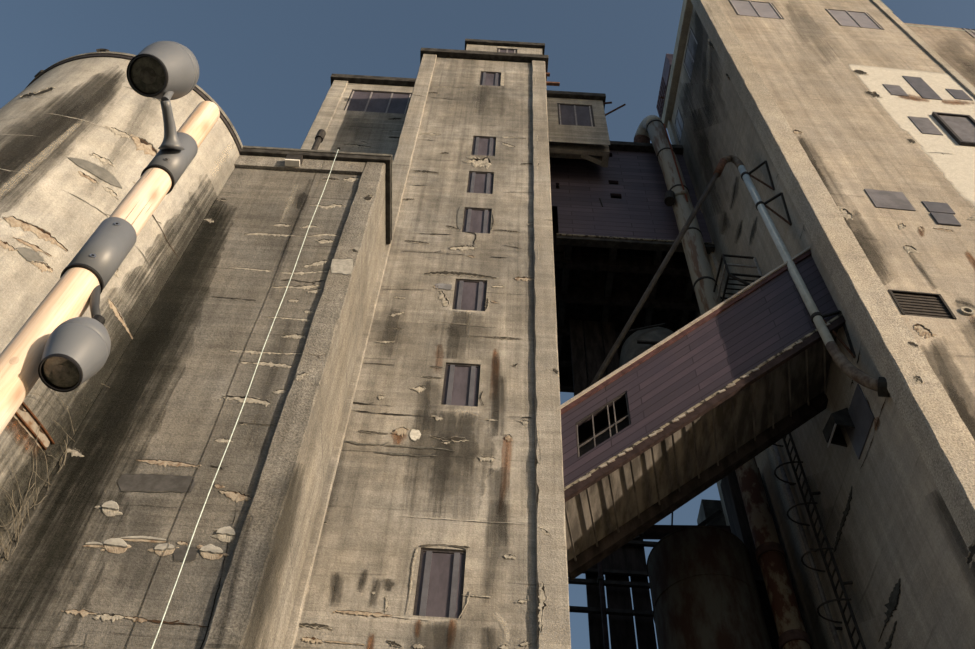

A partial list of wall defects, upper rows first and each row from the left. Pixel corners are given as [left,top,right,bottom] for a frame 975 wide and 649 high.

leakage [0,73,118,211]
spalling [105,126,158,156]
spalling [0,215,68,272]
spalling [83,526,236,560]
peeling [879,578,901,649]